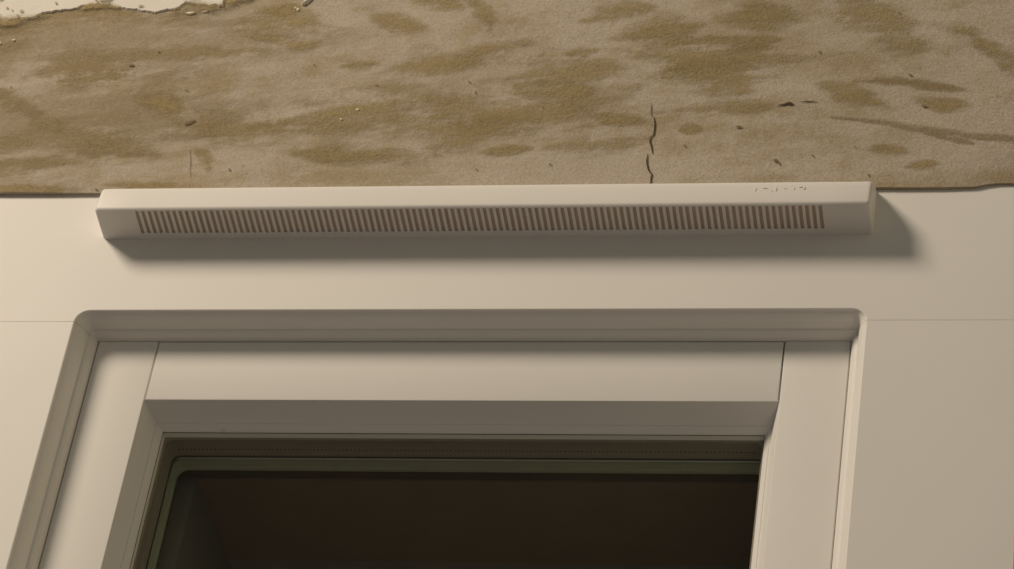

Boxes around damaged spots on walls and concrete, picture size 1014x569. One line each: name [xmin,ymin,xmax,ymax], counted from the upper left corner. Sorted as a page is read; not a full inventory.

water stain [0,7,148,54]
water stain [42,4,316,83]
water stain [396,44,500,74]
water stain [302,49,640,155]
water stain [583,1,799,112]
water stain [823,78,965,113]
crack [646,103,656,184]
water stain [0,184,65,192]